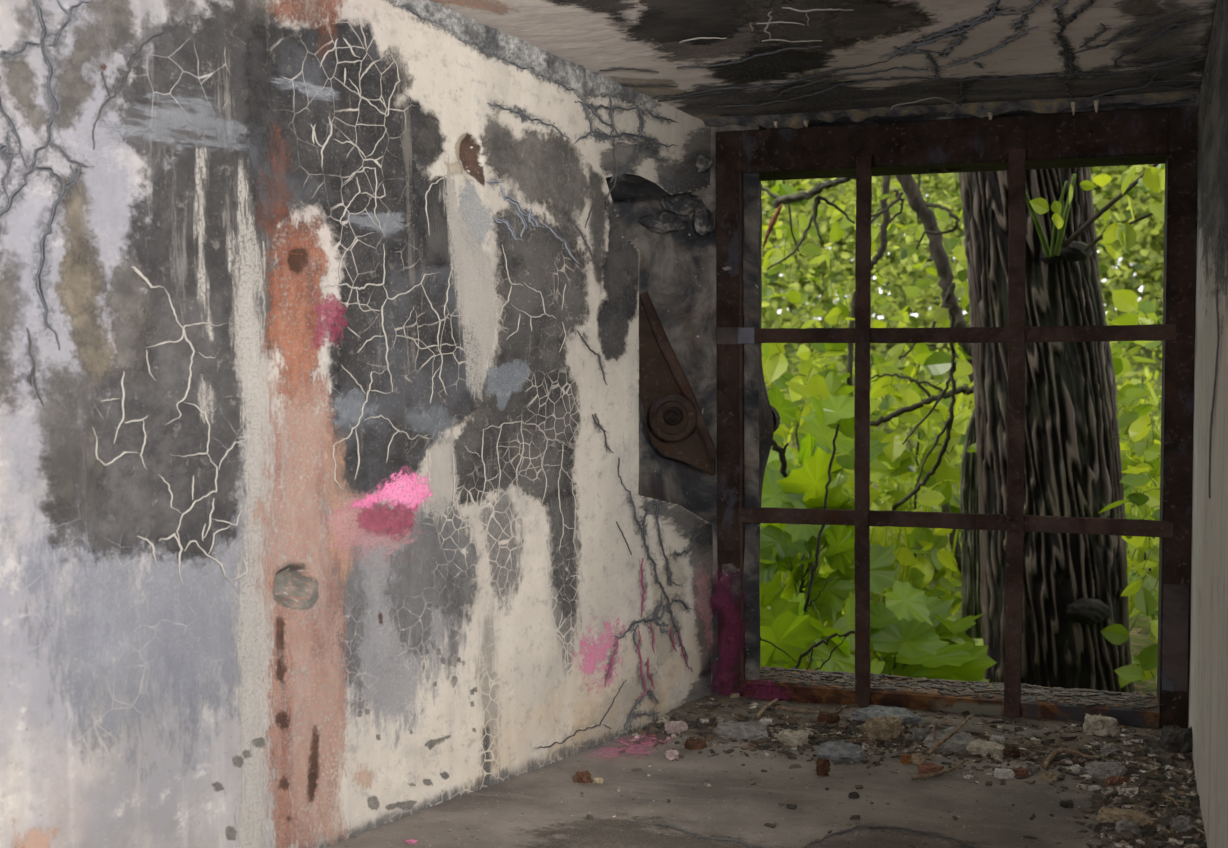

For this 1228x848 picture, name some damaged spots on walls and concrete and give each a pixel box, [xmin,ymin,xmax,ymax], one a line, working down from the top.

leakage [0,253,22,406]
crack [0,0,184,406]
crack [92,266,296,585]
leakage [4,0,590,848]
crack [310,38,580,564]
rust [459,133,485,186]
crack [538,414,699,748]
spalling [661,193,716,236]
leakage [547,0,937,85]
crack [389,0,1204,385]
crack [1209,289,1220,498]